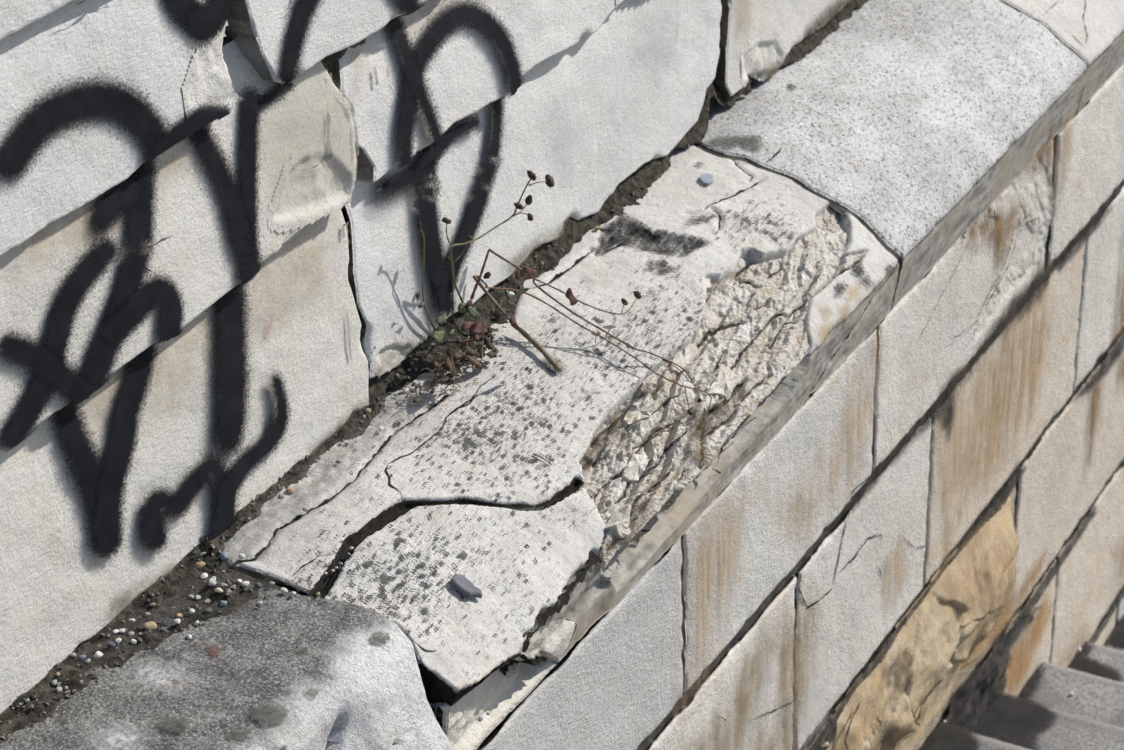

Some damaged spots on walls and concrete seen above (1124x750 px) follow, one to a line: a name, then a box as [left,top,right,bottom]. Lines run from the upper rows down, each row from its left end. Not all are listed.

crack [1038,0,1088,49]
spalling [567,206,866,567]
crack [810,271,895,393]
crack [229,258,862,750]
crack [798,472,926,644]
crack [844,702,885,750]